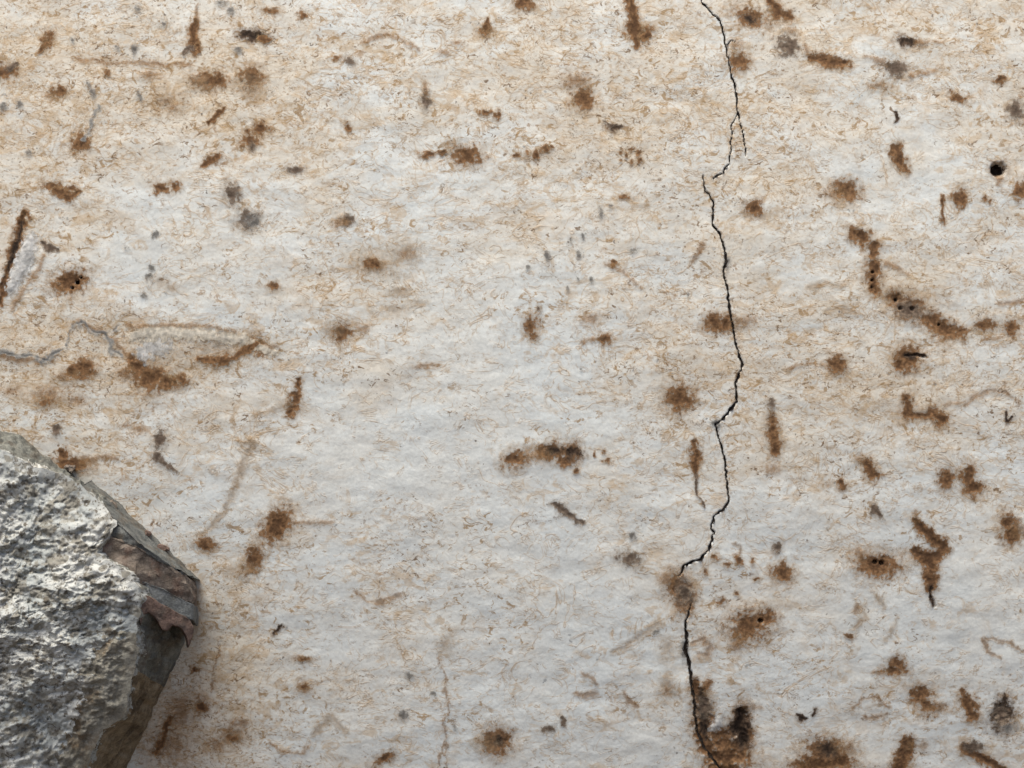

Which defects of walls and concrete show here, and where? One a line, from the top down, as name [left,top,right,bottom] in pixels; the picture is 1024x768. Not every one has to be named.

corrosion [622,0,655,50]
crack [681,0,746,573]
corrosion [974,318,1020,340]
corrosion [662,383,699,415]
corrosion [901,389,1021,429]
corrosion [500,439,588,471]
corrosion [934,464,986,500]
corrosion [241,503,332,576]
crack [679,605,720,768]